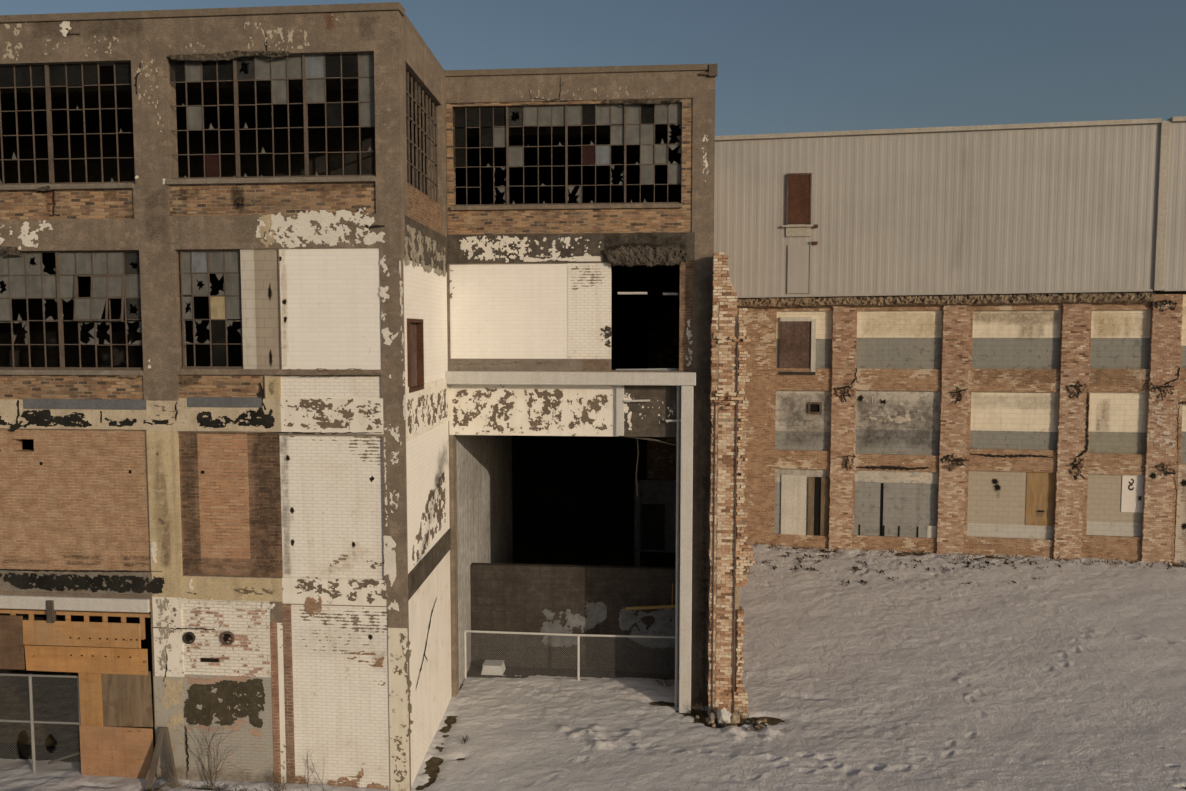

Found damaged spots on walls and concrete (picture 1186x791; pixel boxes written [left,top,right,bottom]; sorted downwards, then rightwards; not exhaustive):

peeling [624,393,673,430]
peeling [256,208,608,789]
peeling [155,579,275,738]
peeling [540,602,675,649]